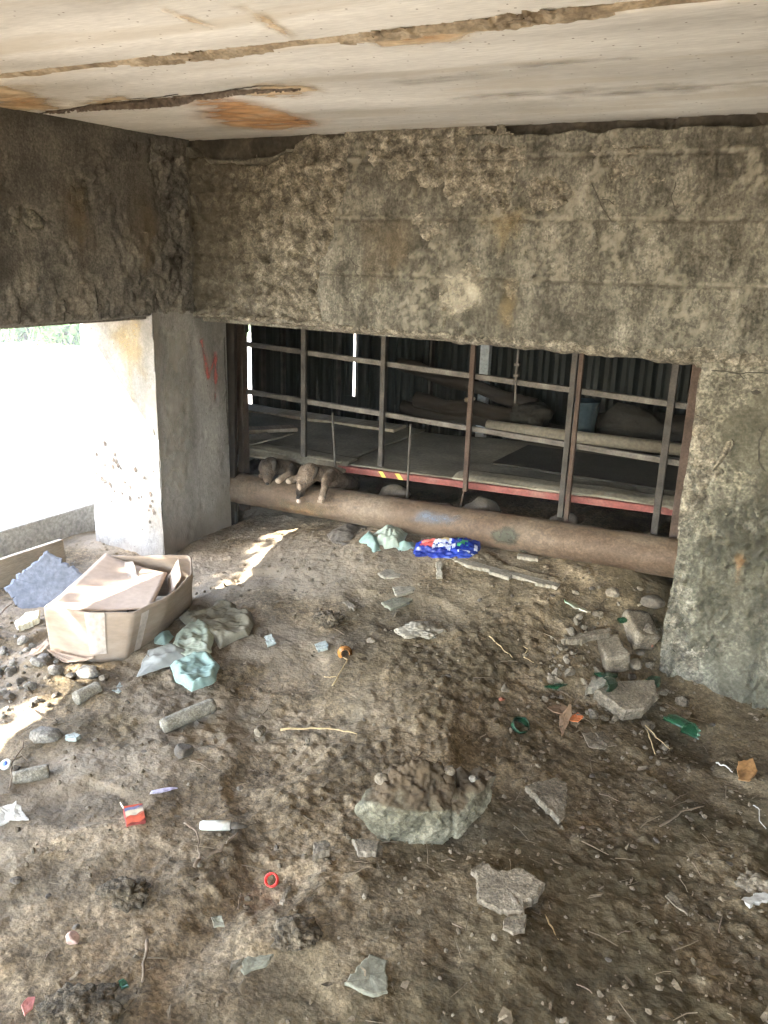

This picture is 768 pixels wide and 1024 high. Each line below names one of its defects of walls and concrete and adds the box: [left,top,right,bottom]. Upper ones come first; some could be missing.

corrosion [0,86,56,110]
corrosion [198,86,315,130]
spalling [149,124,768,578]